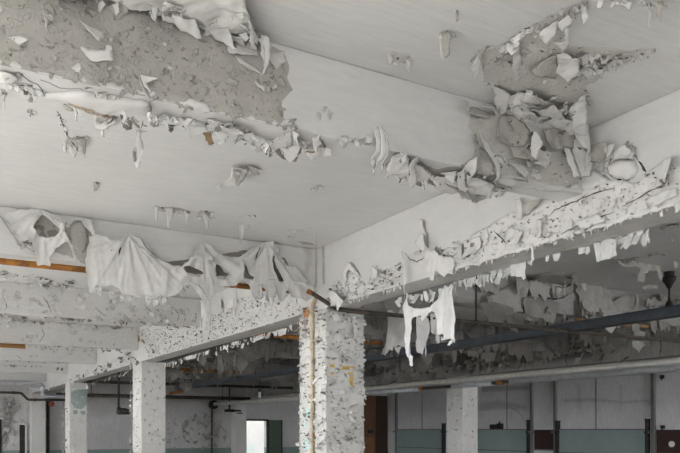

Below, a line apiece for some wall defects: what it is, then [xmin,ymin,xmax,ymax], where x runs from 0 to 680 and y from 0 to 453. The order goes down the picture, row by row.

peeling [0,0,333,168]
peeling [337,0,656,203]
peeling [597,0,668,29]
peeling [0,157,680,453]